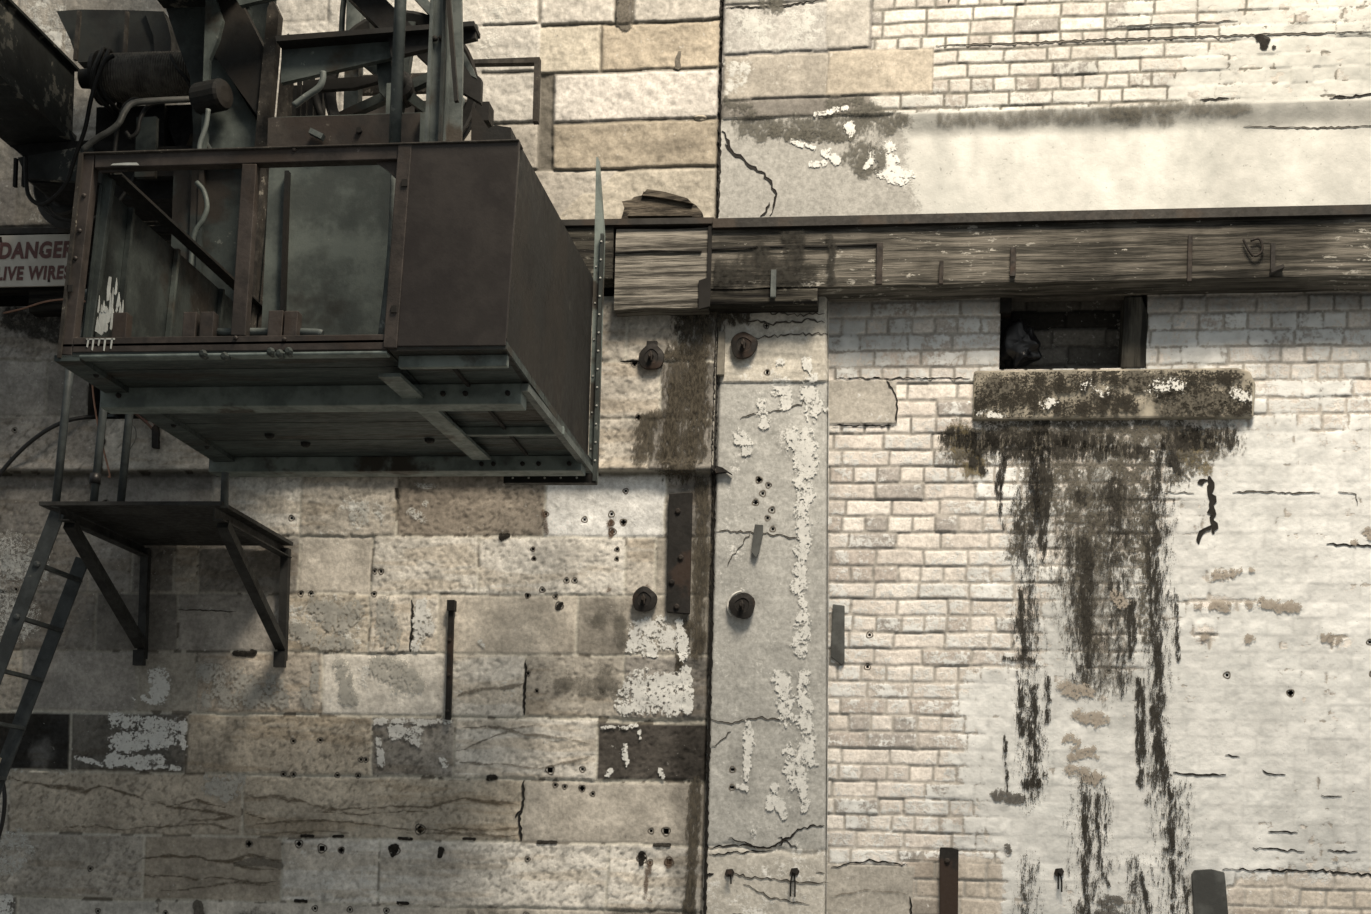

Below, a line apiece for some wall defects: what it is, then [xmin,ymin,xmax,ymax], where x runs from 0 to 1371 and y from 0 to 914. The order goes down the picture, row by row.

crack [615,0,877,254]
peeling [813,105,855,138]
crack [936,20,1370,46]
crack [1200,93,1371,129]
water stain [1145,377,1187,394]
water stain [630,312,750,674]
flaking render [74,667,188,771]
flaking render [600,615,694,777]
peeling [733,356,830,822]
crack [702,312,907,914]
water stain [935,397,1247,914]
water stain [614,776,704,914]